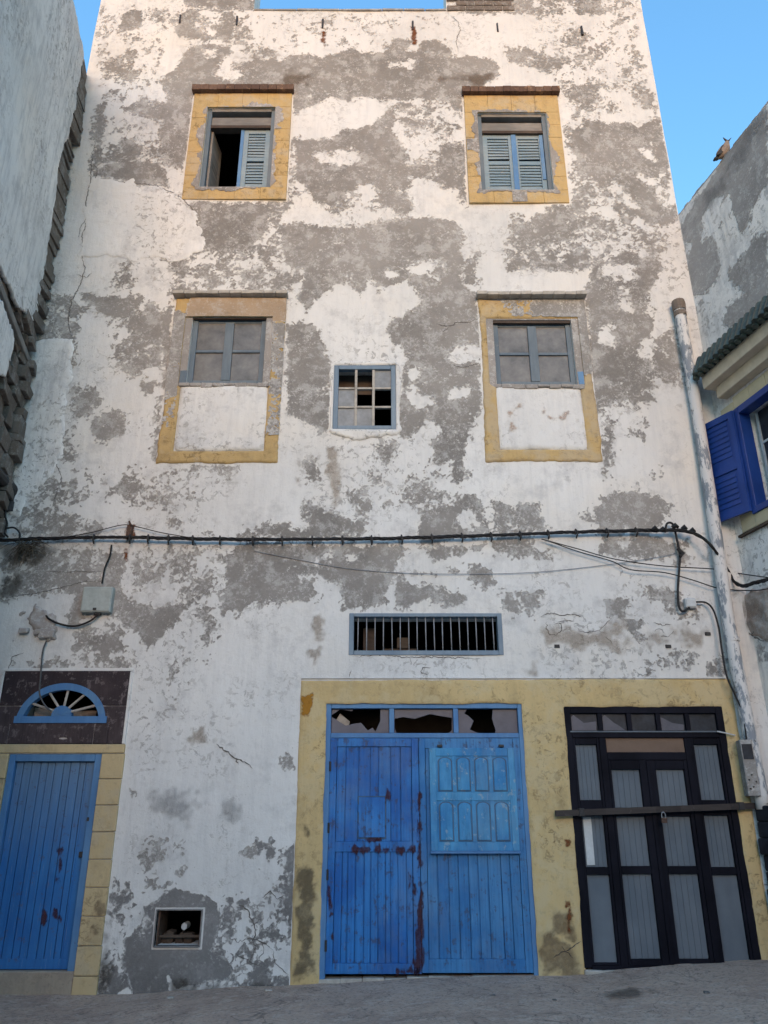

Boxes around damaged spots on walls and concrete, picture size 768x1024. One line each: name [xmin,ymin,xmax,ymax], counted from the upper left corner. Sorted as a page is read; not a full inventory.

crack [68,137,207,339]
peeling [0,0,768,704]
peeling [278,746,296,772]
rust [41,908,62,926]
spalling [98,827,294,994]
leakage [294,869,313,974]